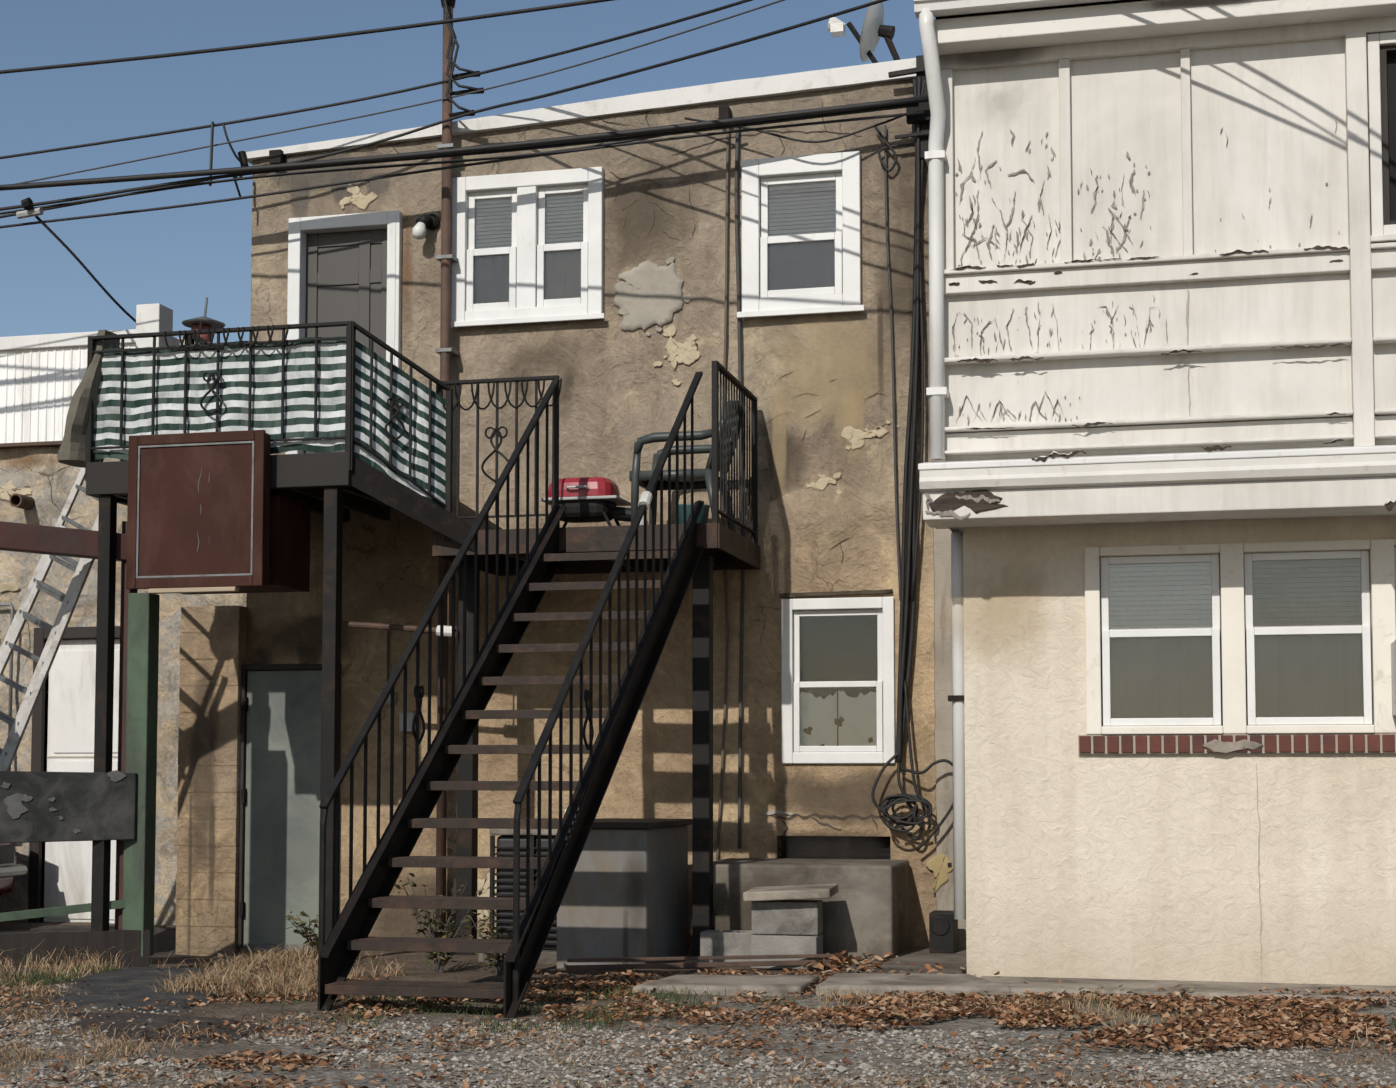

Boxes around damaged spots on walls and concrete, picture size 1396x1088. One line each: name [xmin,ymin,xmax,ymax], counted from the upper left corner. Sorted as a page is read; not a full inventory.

peeling [339,184,379,210]
peeling [949,129,1159,285]
peeling [1298,231,1348,262]
peeling [646,320,701,386]
peeling [952,302,1062,363]
peeling [1082,295,1202,355]
spalling [841,420,899,450]
peeling [956,391,1113,430]
crack [0,466,83,527]
spalling [806,472,842,495]
peeling [925,495,1000,520]
crack [1255,764,1263,981]